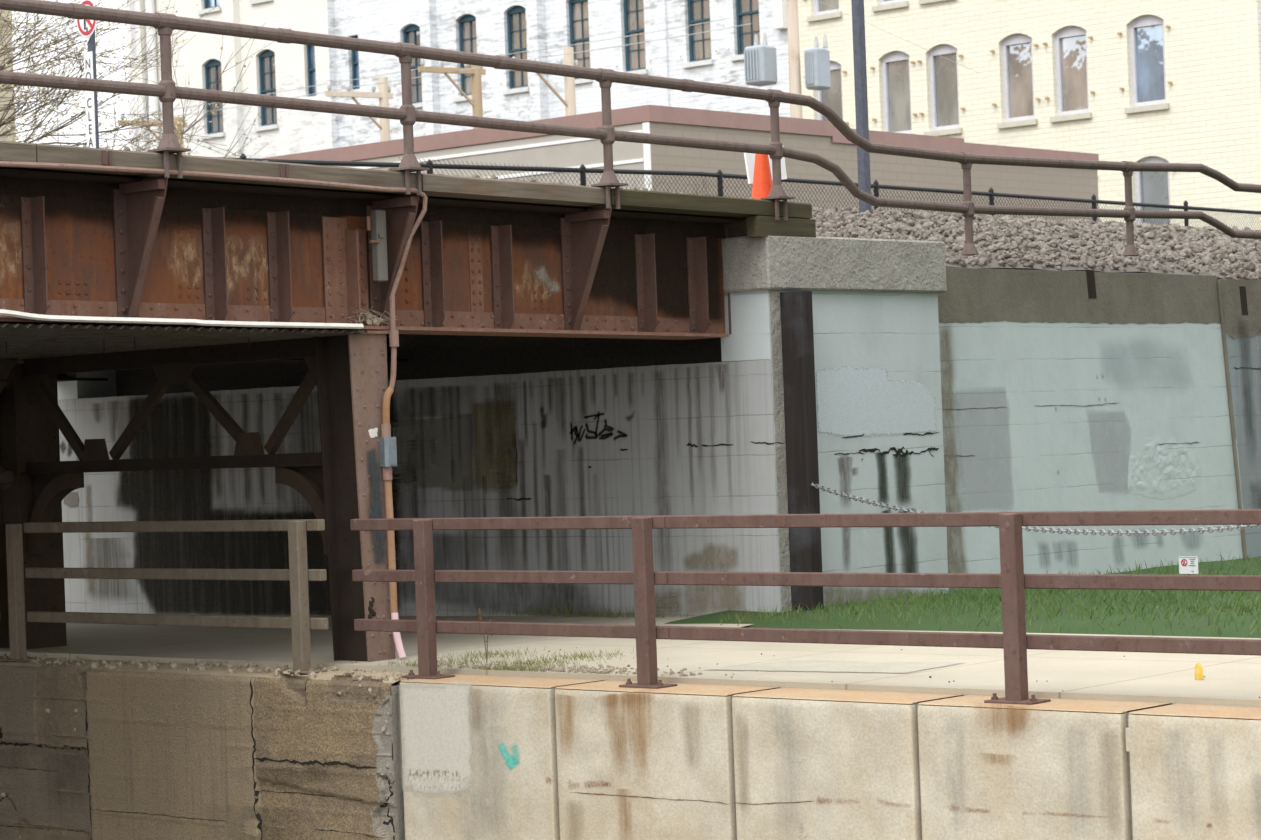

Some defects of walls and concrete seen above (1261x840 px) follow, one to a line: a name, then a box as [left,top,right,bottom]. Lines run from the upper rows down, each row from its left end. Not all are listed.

corrosion [227,243,269,289]
leakage [473,382,527,555]
leakage [839,457,856,500]
leakage [876,452,916,573]
crack [0,680,395,840]
spalling [327,673,399,840]